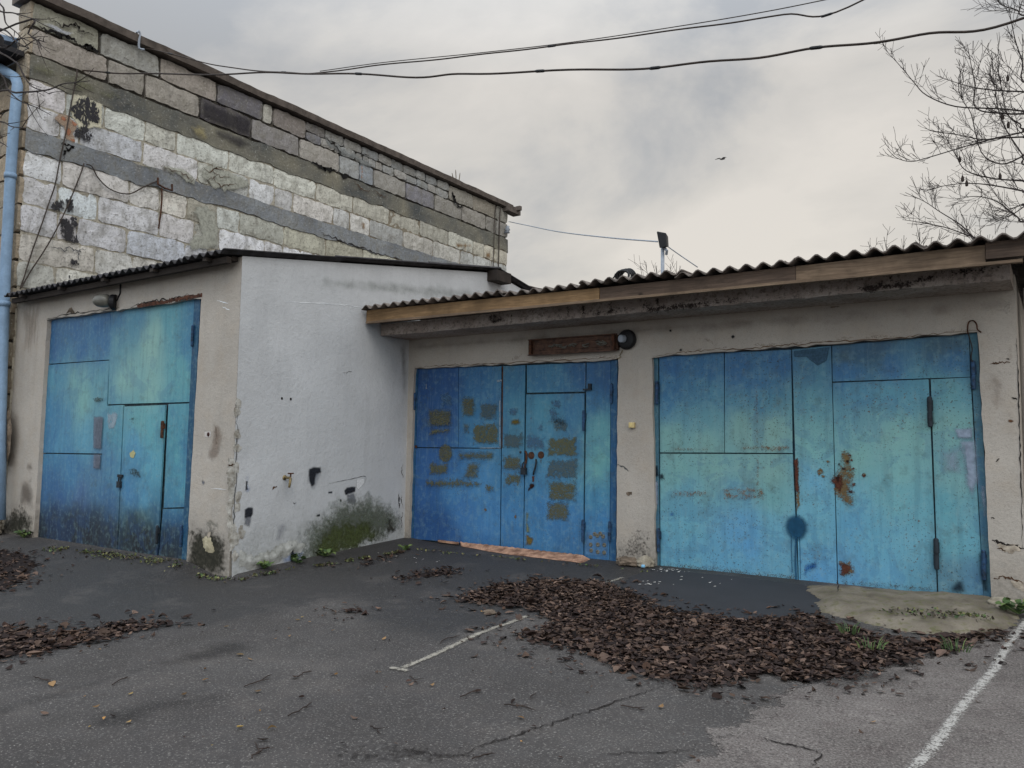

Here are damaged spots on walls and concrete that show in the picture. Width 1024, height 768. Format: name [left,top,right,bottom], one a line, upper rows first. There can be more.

peeling [55,94,102,143]
peeling [51,196,79,243]
spalling [226,398,246,562]
rust [817,451,866,505]
damp [285,487,396,561]
damp [190,531,224,572]
rust [839,561,854,576]